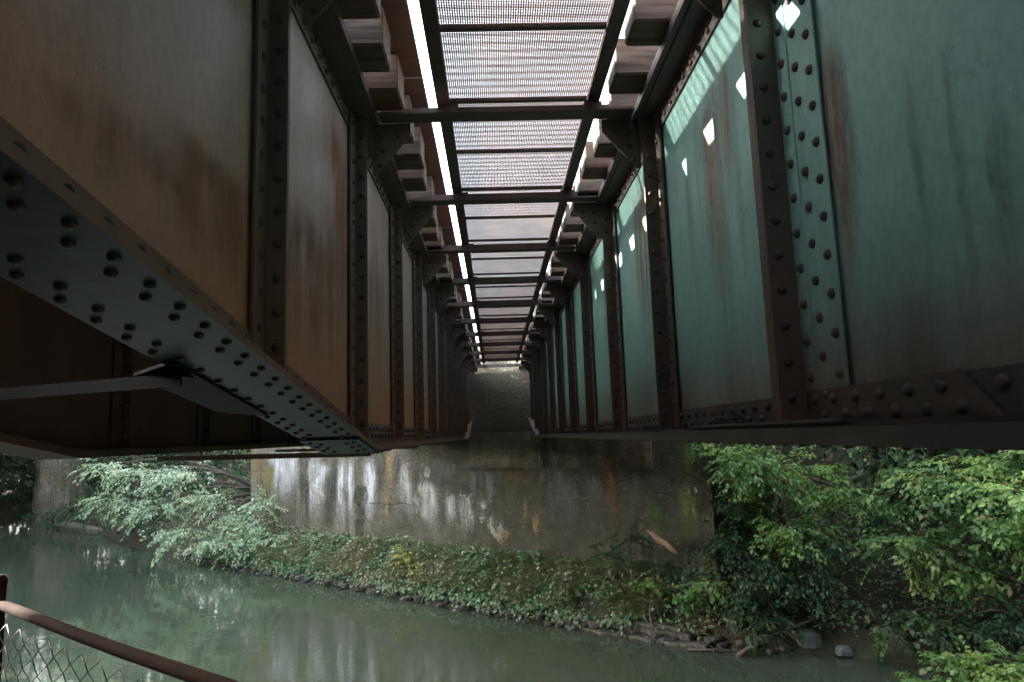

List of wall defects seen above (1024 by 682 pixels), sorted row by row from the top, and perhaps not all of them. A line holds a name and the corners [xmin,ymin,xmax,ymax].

rust [821,55,848,201]
damp [366,450,495,515]